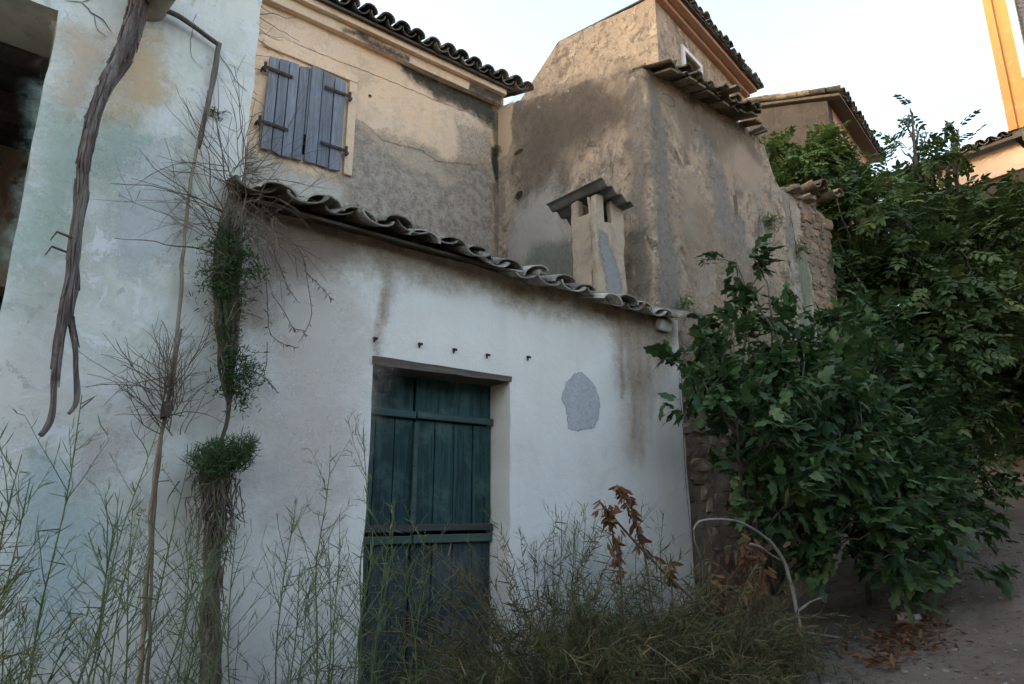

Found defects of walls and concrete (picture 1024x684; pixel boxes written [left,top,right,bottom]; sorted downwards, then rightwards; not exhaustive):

peeling [363,128,465,190]
peeling [457,126,494,171]
leakage [241,28,774,339]